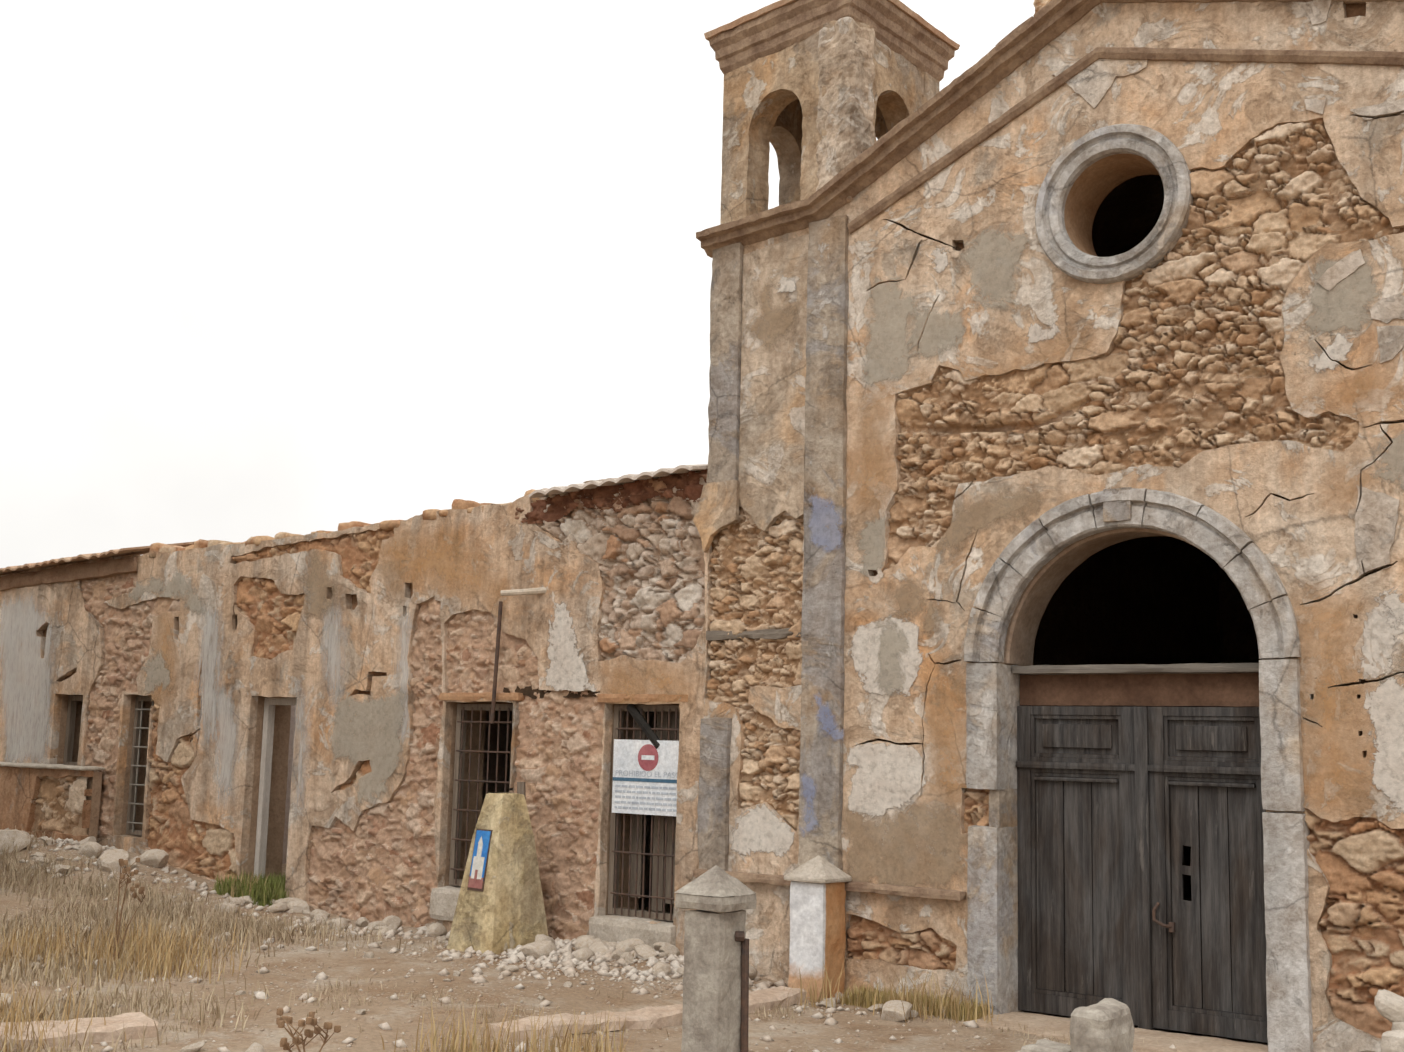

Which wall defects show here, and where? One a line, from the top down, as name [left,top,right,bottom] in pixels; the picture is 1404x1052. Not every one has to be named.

peeling [1316,249,1365,291]
crack [1381,421,1404,443]
crack [1304,565,1392,605]